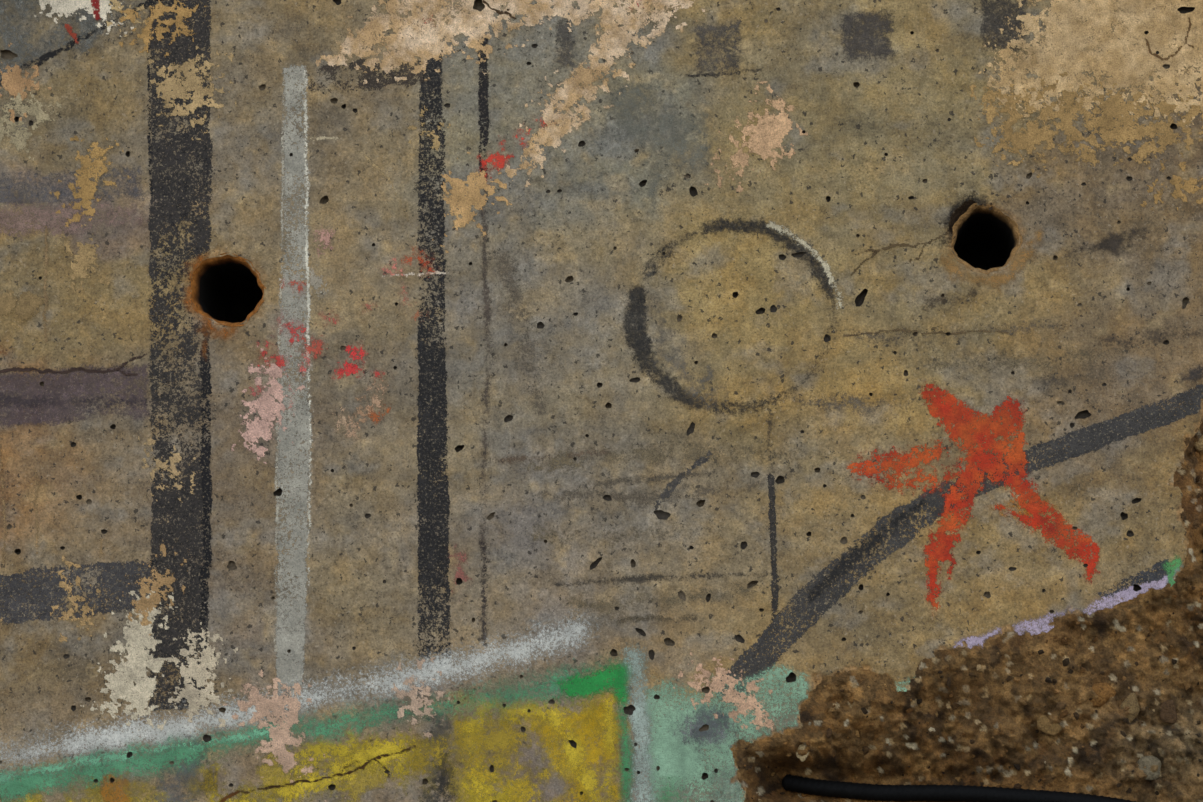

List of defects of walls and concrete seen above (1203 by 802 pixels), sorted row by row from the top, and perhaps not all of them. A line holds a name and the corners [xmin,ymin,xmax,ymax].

peeling [310,0,705,253]
peeling [684,81,808,197]
peeling [969,0,1203,211]
spalling [947,199,993,239]
spalling [855,288,868,307]
spalling [1070,410,1091,428]
spalling [654,510,671,520]
spalling [673,416,1203,802]
spalling [635,628,675,660]
crack [220,745,416,802]